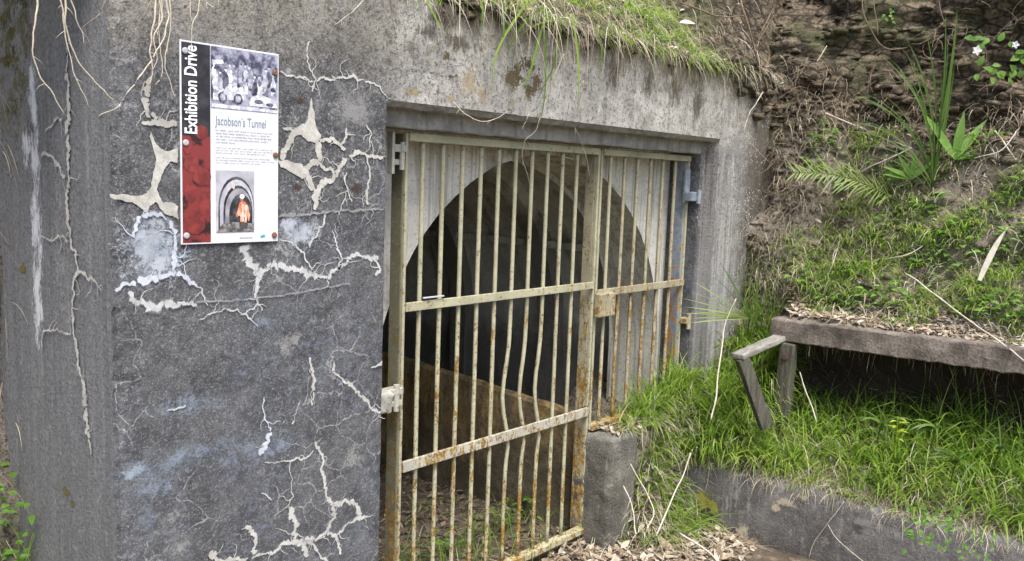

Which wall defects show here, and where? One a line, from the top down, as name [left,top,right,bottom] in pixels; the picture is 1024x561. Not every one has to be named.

damp [22,61,44,350]
spalling [110,76,179,218]
crack [39,26,384,454]
spalling [278,98,387,210]
crack [241,357,385,561]